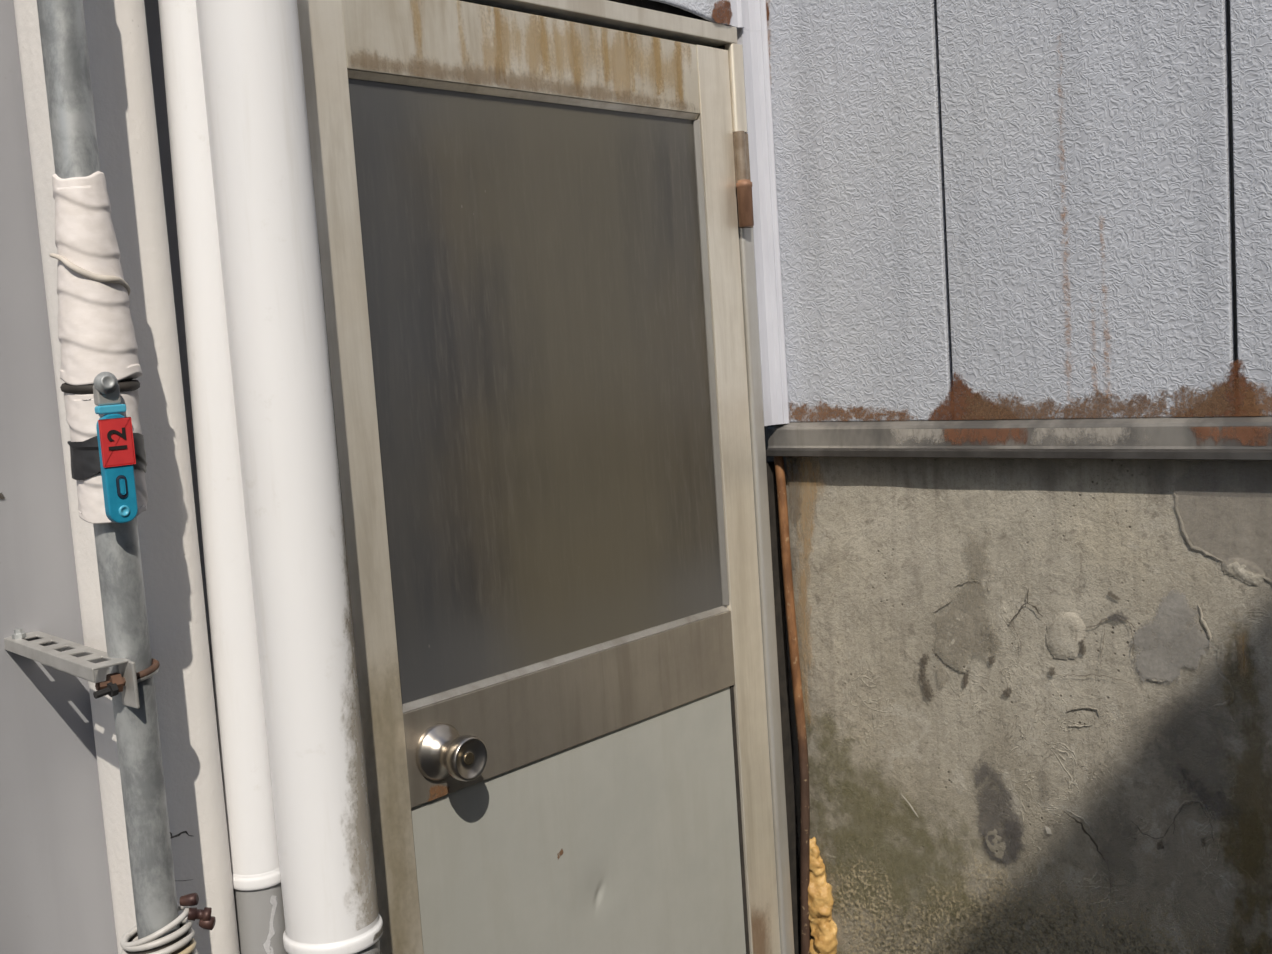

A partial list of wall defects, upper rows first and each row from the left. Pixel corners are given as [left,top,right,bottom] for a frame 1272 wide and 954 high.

rust [789,360,1272,446]
crack [1009,589,1042,651]
water stain [975,762,1023,864]